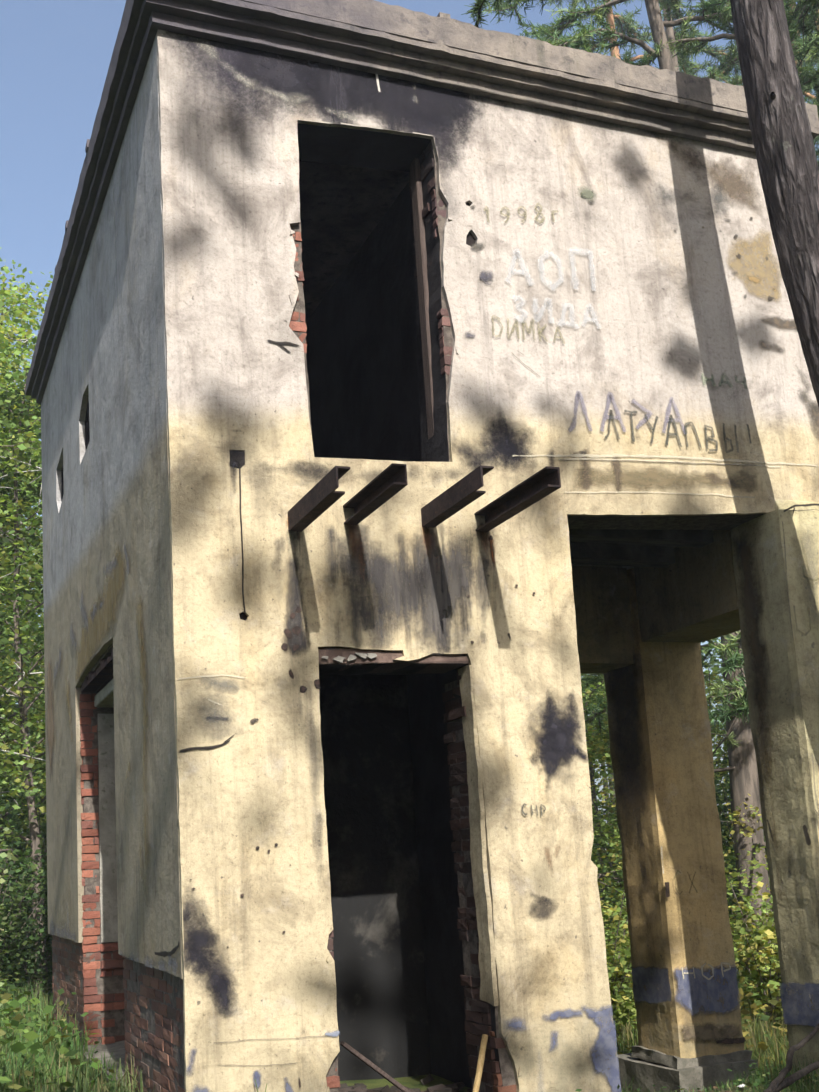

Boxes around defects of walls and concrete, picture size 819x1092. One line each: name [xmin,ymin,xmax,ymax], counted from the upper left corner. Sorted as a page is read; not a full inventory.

water stain [173,32,473,141]
flaking render [290,230,304,282]
crack [268,340,299,353]
flaking render [289,295,307,353]
water stain [459,420,524,468]
water stain [281,531,311,656]
water stain [329,527,488,651]
crack [179,735,234,752]
water stain [533,698,587,781]
peeling [631,966,746,1044]
peeling [779,982,819,1027]
peeling [547,1006,621,1092]